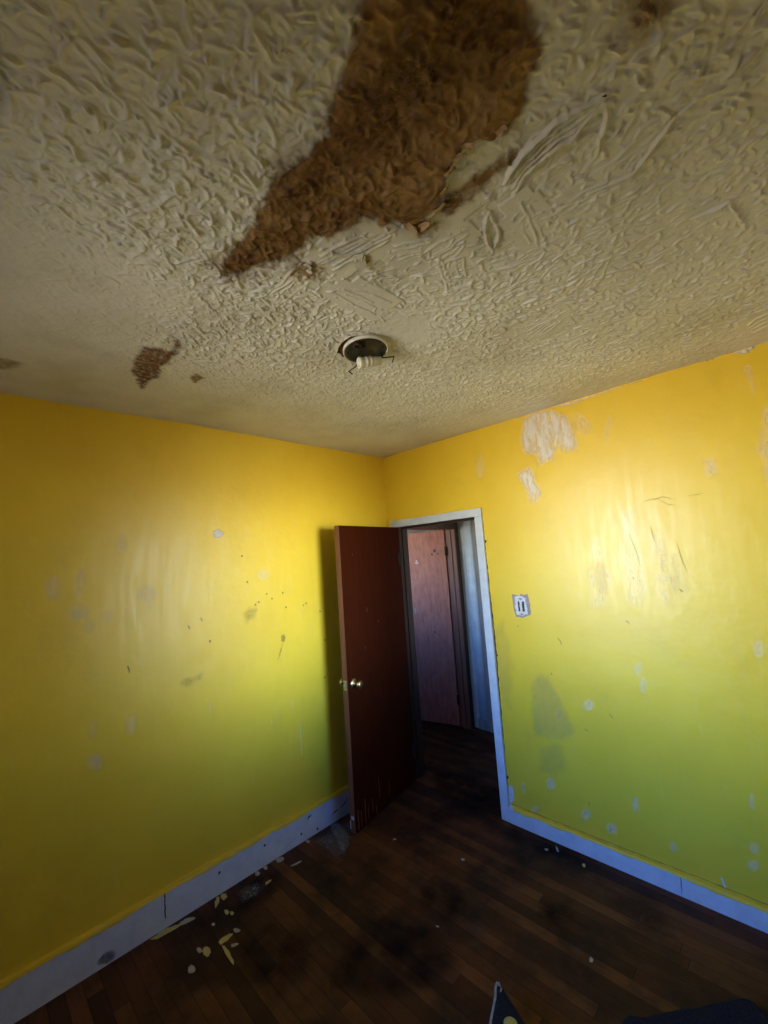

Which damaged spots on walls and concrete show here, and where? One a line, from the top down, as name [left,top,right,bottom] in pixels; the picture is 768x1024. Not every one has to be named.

water stain [223,0,541,273]
peeling [523,386,622,463]
peeling [520,469,539,500]